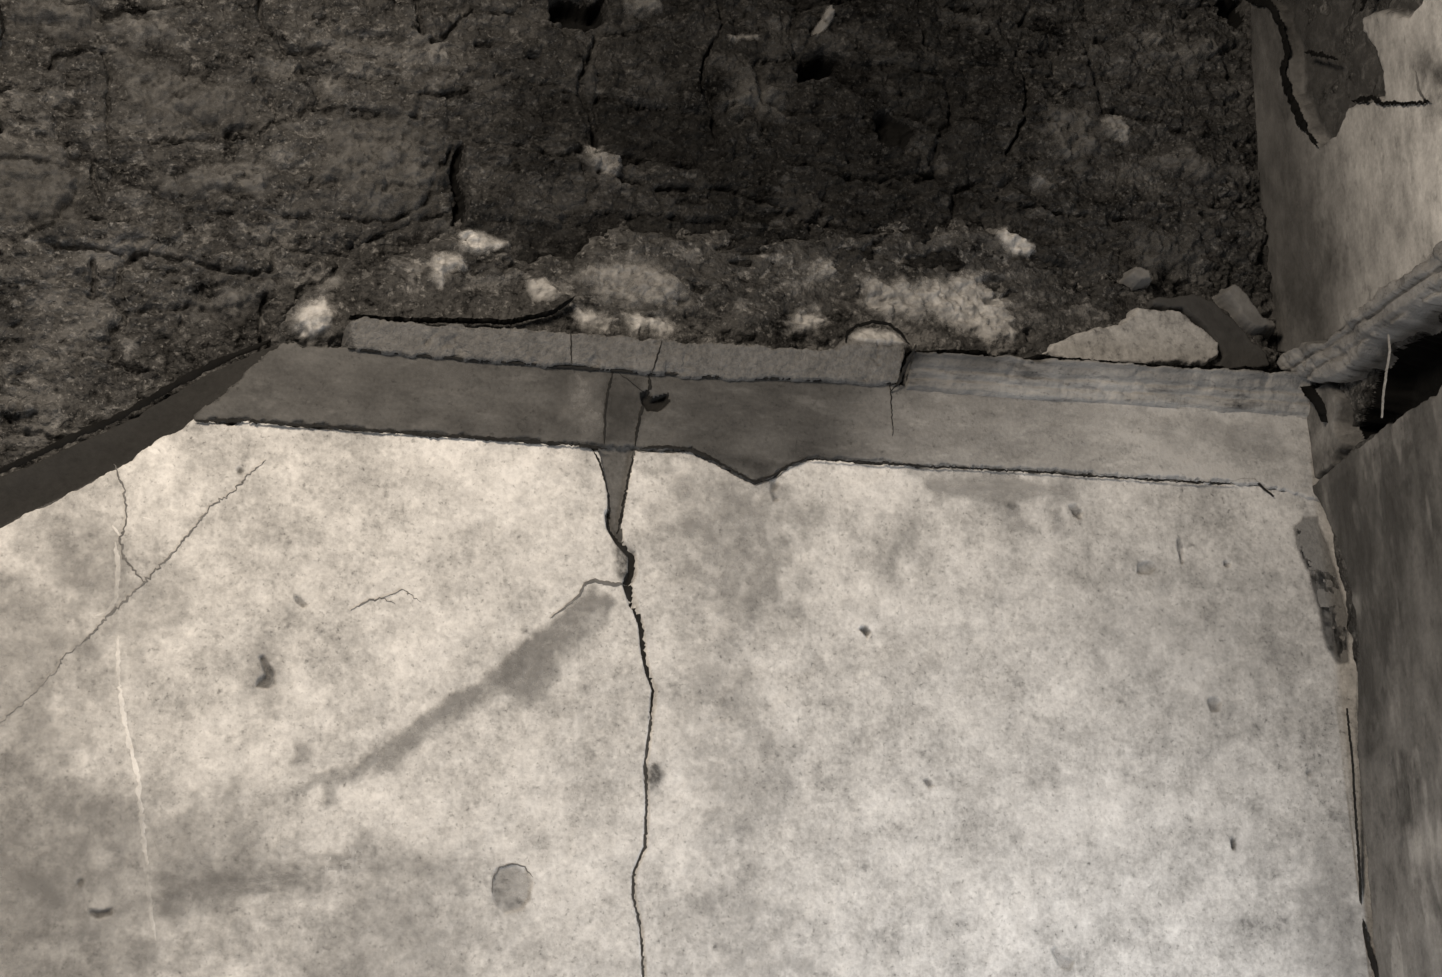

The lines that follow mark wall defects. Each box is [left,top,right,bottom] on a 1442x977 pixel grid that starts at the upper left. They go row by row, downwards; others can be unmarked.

crack [0,6,8,40]
flaking render [1283,0,1423,139]
flaking render [0,0,1283,476]
crack [0,340,271,474]
crack [1,461,264,722]
leakage [330,590,614,784]
crack [195,296,1328,977]